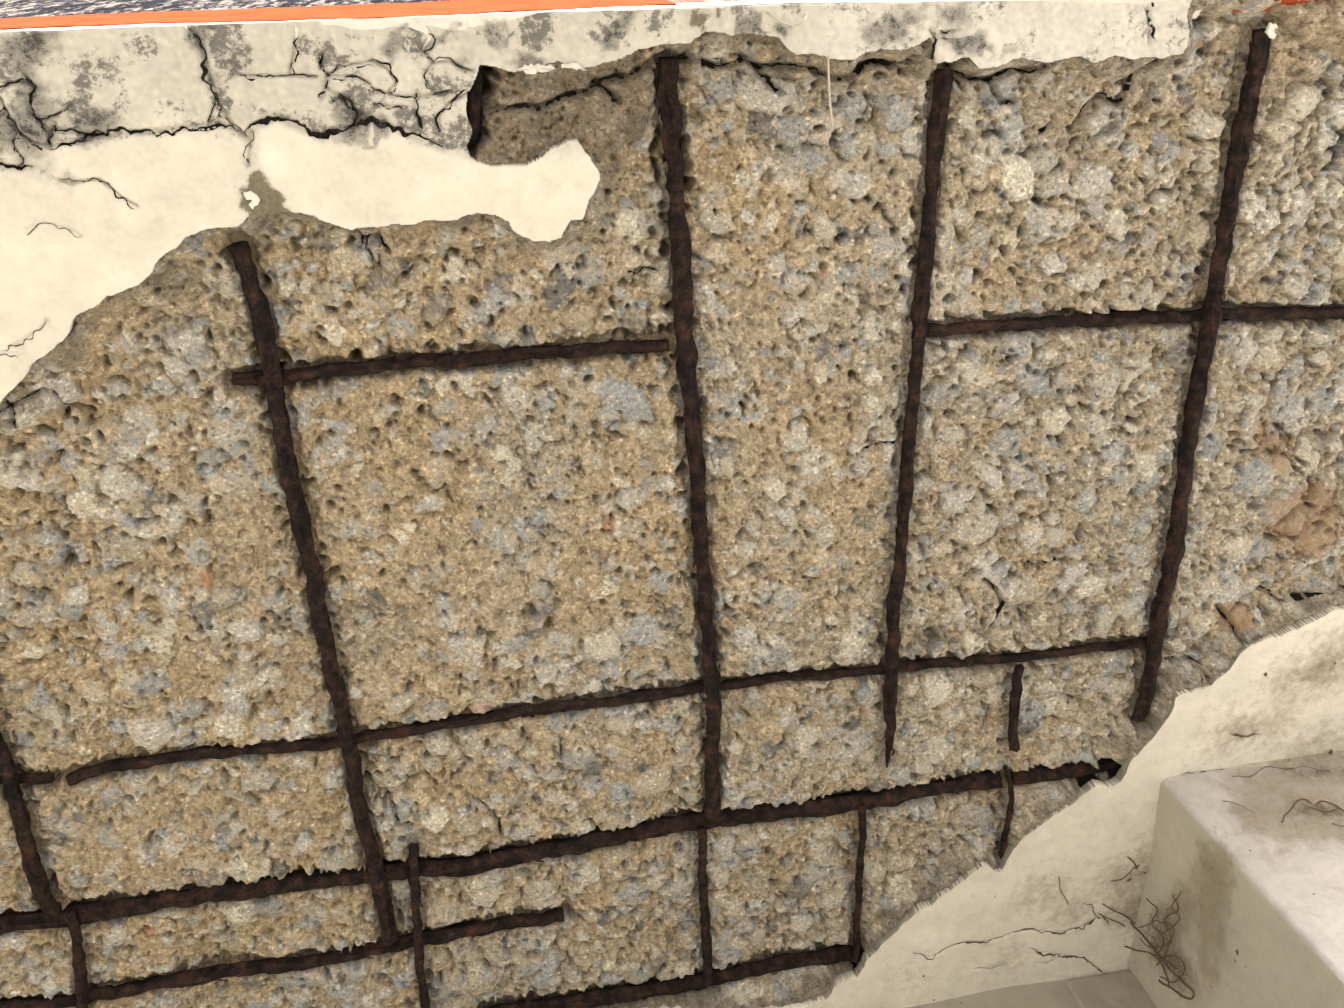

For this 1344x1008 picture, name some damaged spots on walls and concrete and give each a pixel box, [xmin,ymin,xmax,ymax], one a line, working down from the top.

peeling [1265,22,1278,39]
leakage [0,31,54,149]
leakage [71,112,114,143]
crack [0,33,469,209]
crack [491,30,1046,114]
crack [27,223,80,238]
peeling [243,190,260,209]
crack [0,318,46,357]
spalling [418,28,1344,1008]
corrosion [1264,483,1340,558]
spalling [0,241,707,1008]
crack [913,904,1109,974]